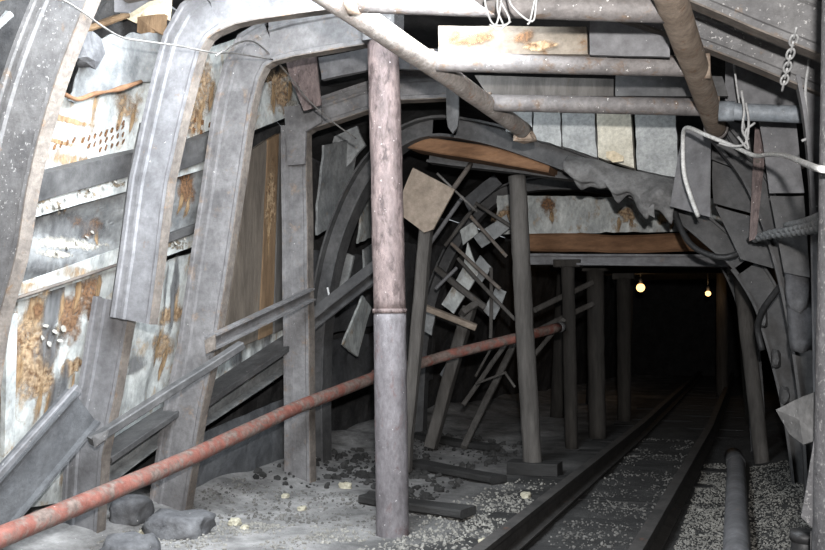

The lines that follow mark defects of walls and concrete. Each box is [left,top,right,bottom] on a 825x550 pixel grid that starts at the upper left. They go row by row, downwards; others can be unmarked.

rust [515,31,558,51]
rust [57,96,98,127]
rust [188,62,215,137]
rust [51,138,88,165]
rust [177,174,195,217]
rust [15,284,82,420]
rust [56,268,102,349]
rust [152,289,182,381]